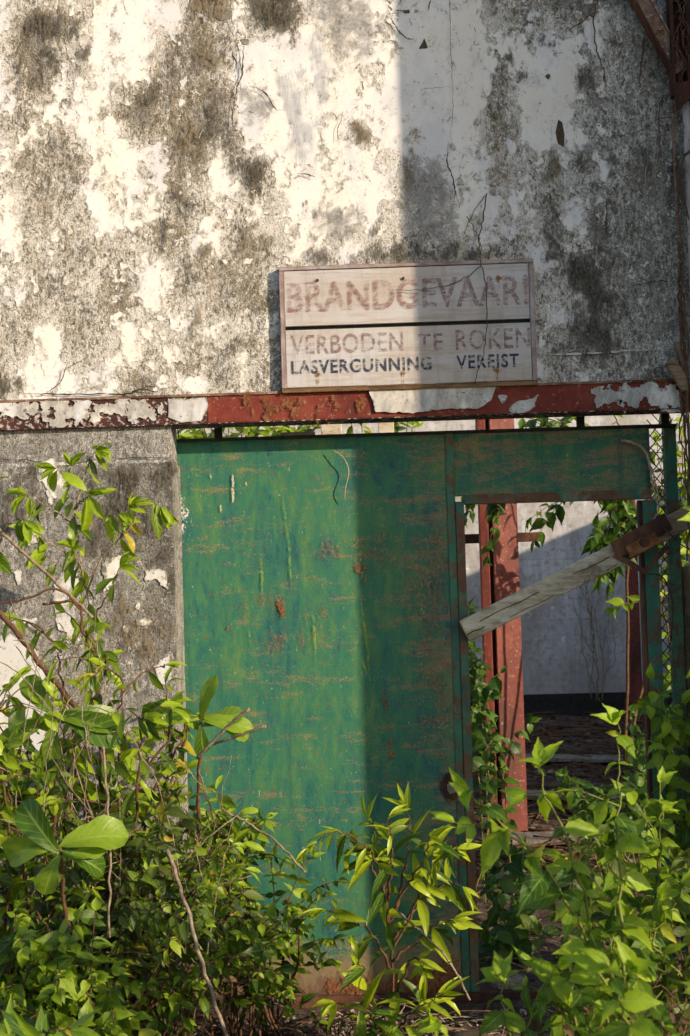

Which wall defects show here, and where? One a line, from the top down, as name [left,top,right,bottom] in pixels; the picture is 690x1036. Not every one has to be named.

leakage [246,0,303,37]
leakage [11,6,91,89]
leakage [147,0,276,192]
leakage [169,188,194,211]
peeling [0,0,617,428]
leakage [159,217,170,252]
leakage [238,222,273,252]
rust [241,390,340,424]
peeling [575,368,681,414]